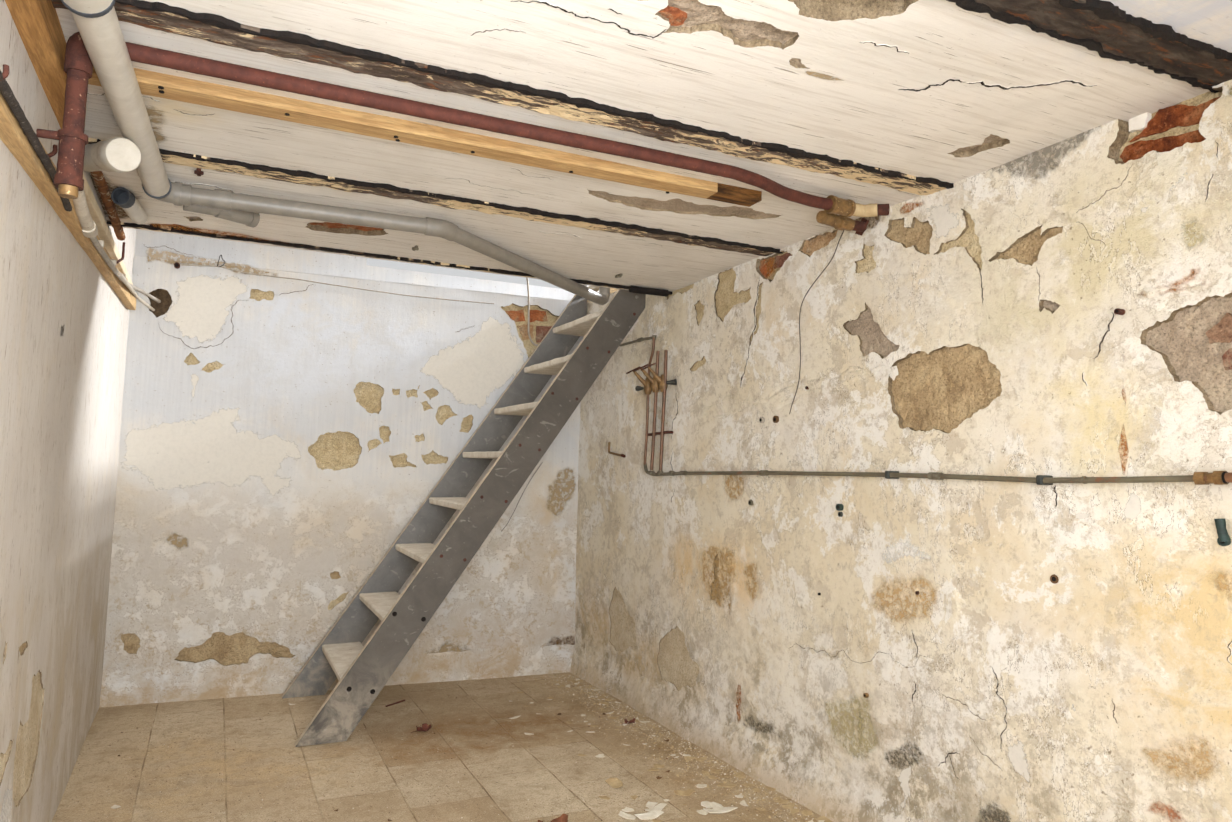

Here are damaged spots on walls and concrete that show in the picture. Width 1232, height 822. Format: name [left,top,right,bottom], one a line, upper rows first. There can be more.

crack [471,0,667,39]
spalling [658,0,798,45]
crack [899,79,1097,92]
spalling [1118,91,1223,163]
spalling [148,290,173,318]
spalling [249,289,274,301]
spalling [846,306,1002,433]
spalling [1146,296,1232,413]
spalling [308,382,473,471]
spalling [175,632,294,666]